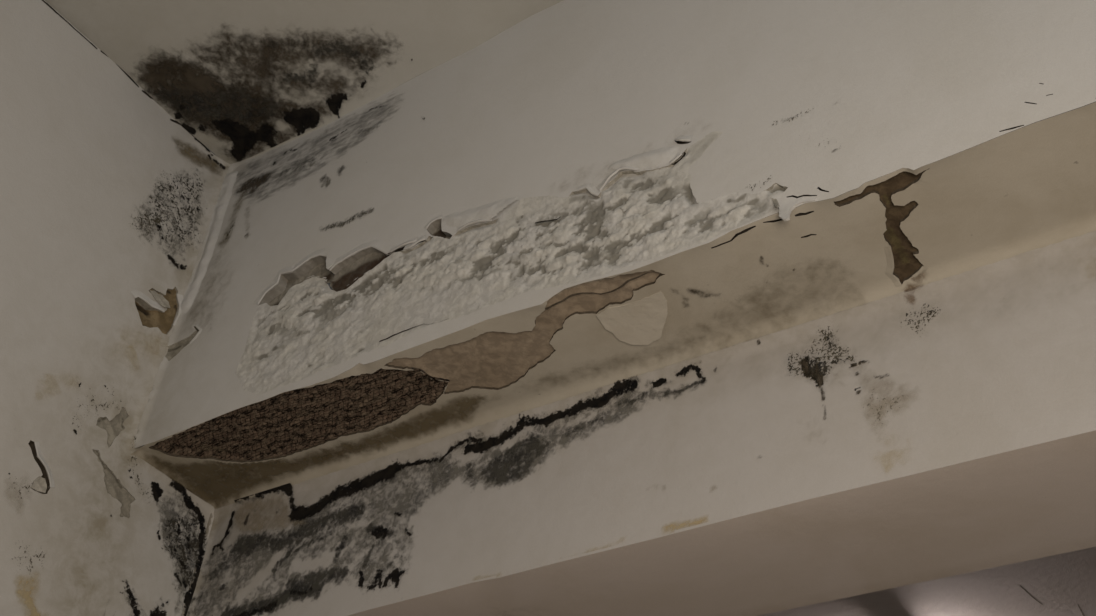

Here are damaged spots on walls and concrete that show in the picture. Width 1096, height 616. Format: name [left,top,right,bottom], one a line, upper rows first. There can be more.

leakage [129,33,390,270]
spalling [424,215,452,239]
flaking render [771,195,819,221]
spalling [834,168,930,287]
spalling [254,240,394,306]
spalling [131,287,202,361]
flaking render [149,270,668,463]
leakage [787,326,866,414]
leakage [120,364,716,616]